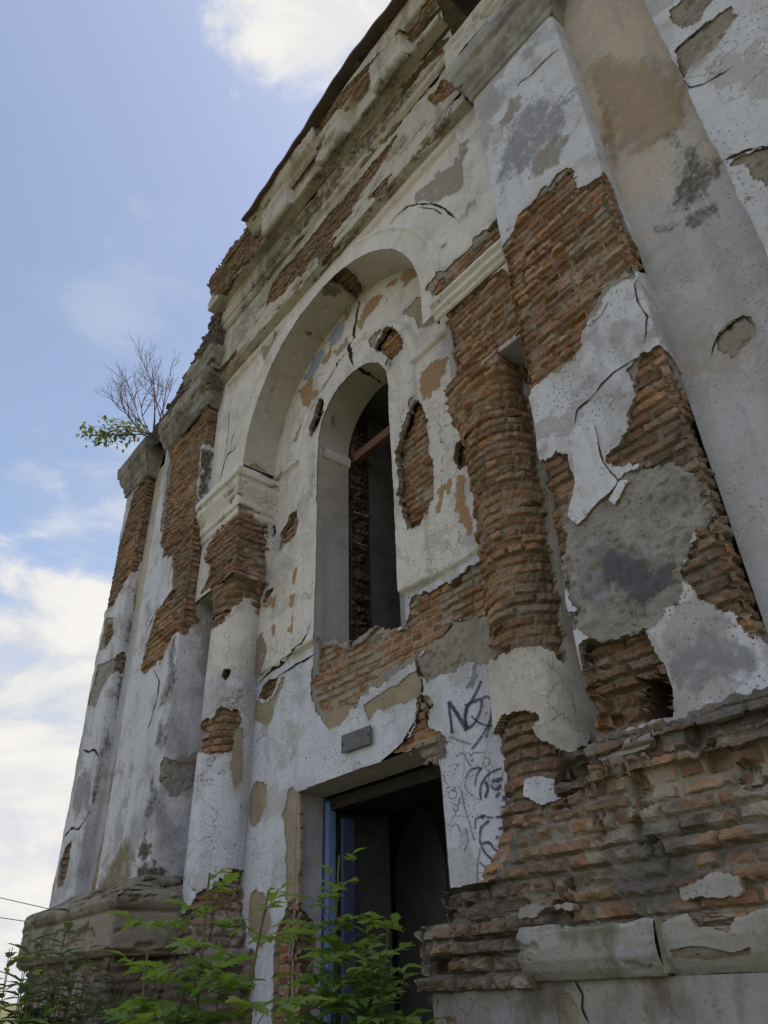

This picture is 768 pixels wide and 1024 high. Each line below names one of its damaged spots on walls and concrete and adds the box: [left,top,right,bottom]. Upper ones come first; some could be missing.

crack [388,203,457,226]
peeling [414,139,469,203]
damp [498,95,568,181]
damp [672,147,720,228]
spalling [206,227,264,296]
crack [321,302,382,391]
crack [574,279,650,425]
flaking render [311,169,768,766]
spalling [89,408,298,727]
spalling [500,712,583,807]
spalling [671,946,751,960]
crack [575,981,589,1023]